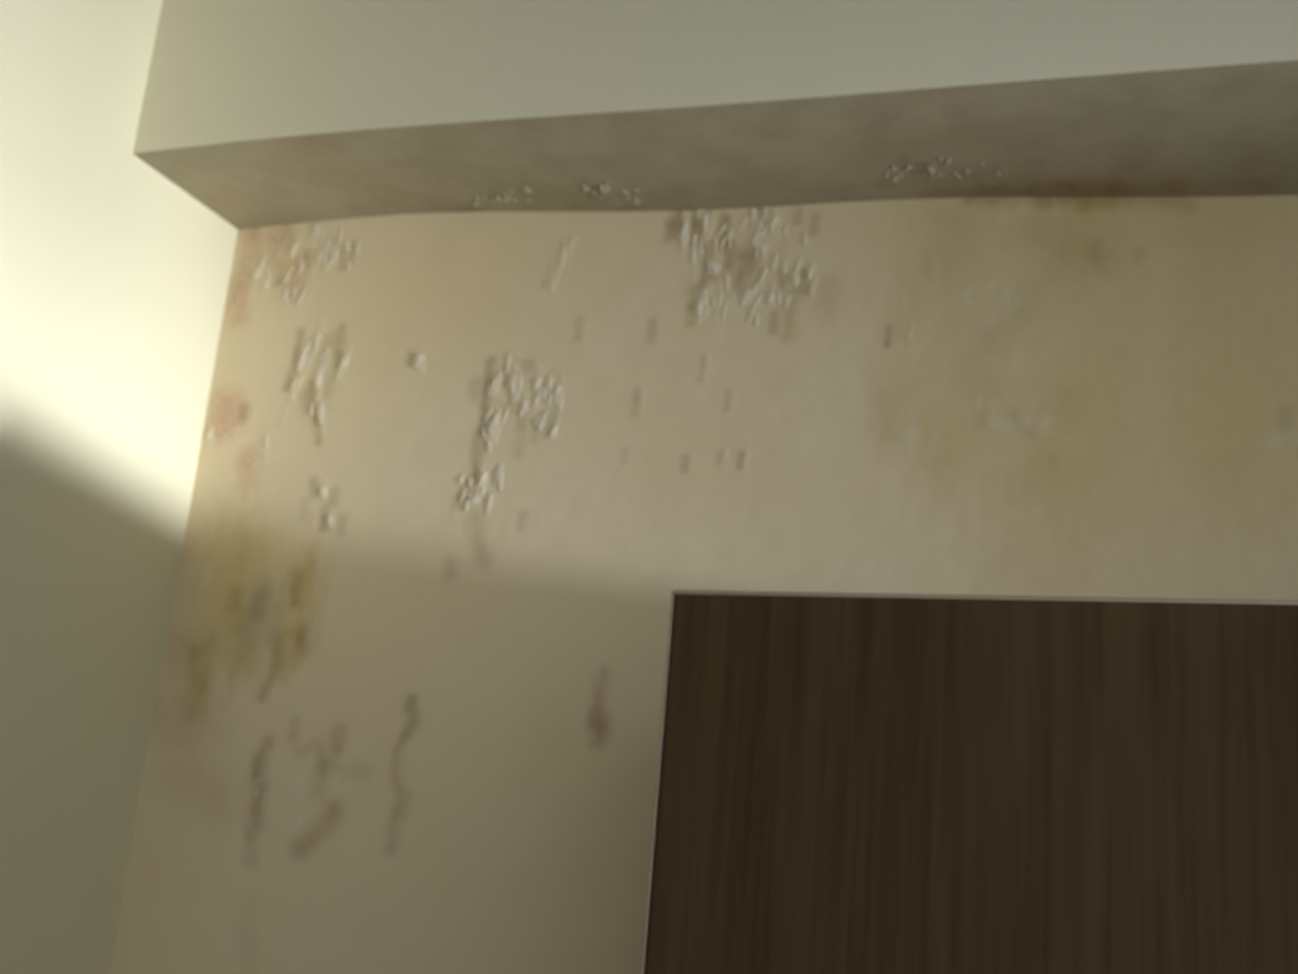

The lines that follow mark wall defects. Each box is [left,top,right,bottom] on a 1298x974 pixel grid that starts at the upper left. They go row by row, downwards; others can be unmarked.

peeling [674,206,819,343]
peeling [265,318,354,449]
peeling [449,349,567,518]
peeling [308,478,344,533]